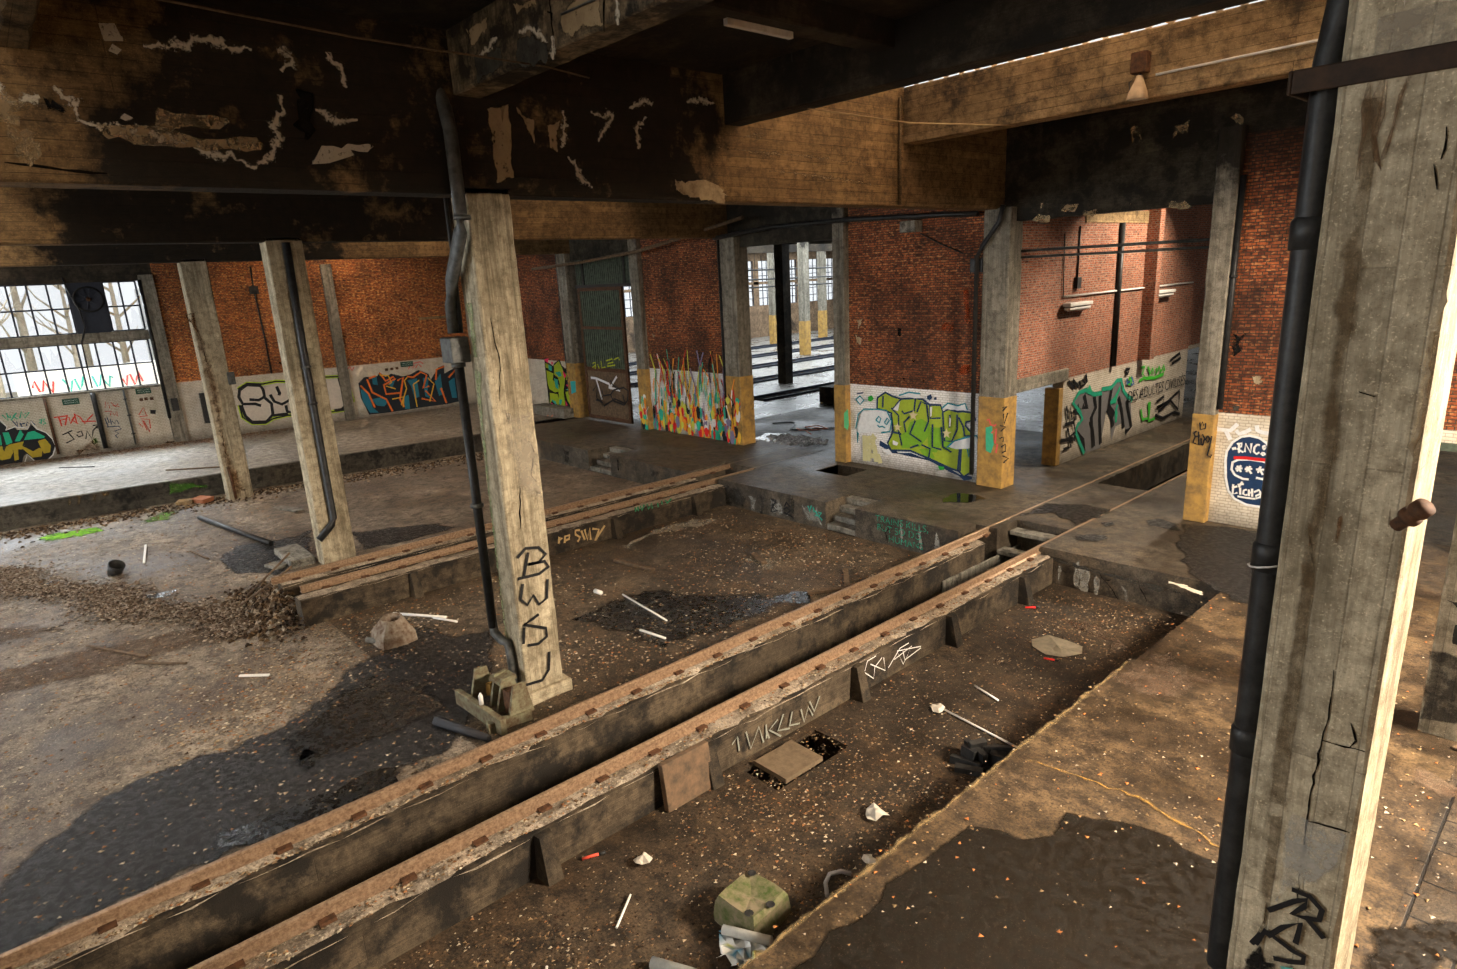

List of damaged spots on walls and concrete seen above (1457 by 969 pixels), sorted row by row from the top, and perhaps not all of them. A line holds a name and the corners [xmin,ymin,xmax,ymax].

peeling [99,23,123,54]
spalling [466,17,548,84]
peeling [560,0,603,38]
peeling [102,108,262,152]
peeling [312,144,372,164]
peeling [487,105,560,183]
leakage [0,627,494,954]
crack [1297,670,1365,898]